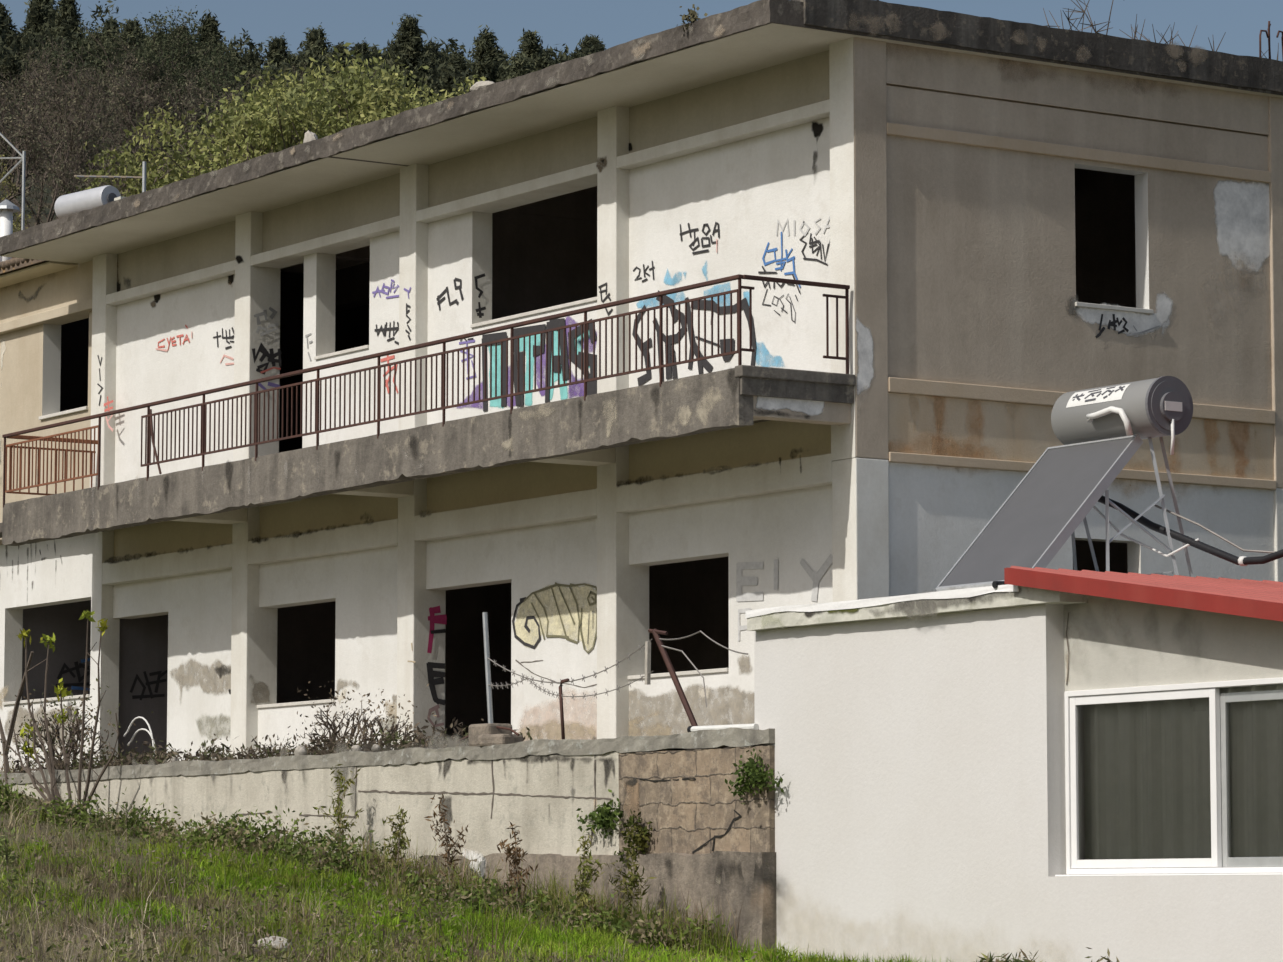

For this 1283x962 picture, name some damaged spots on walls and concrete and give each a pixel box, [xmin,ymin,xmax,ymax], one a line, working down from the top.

peeling [1214,181,1270,290]
peeling [1068,293,1172,336]
peeling [856,318,874,395]
peeling [171,660,231,694]
peeling [739,656,750,672]
peeling [198,715,231,738]
peeling [628,685,755,736]